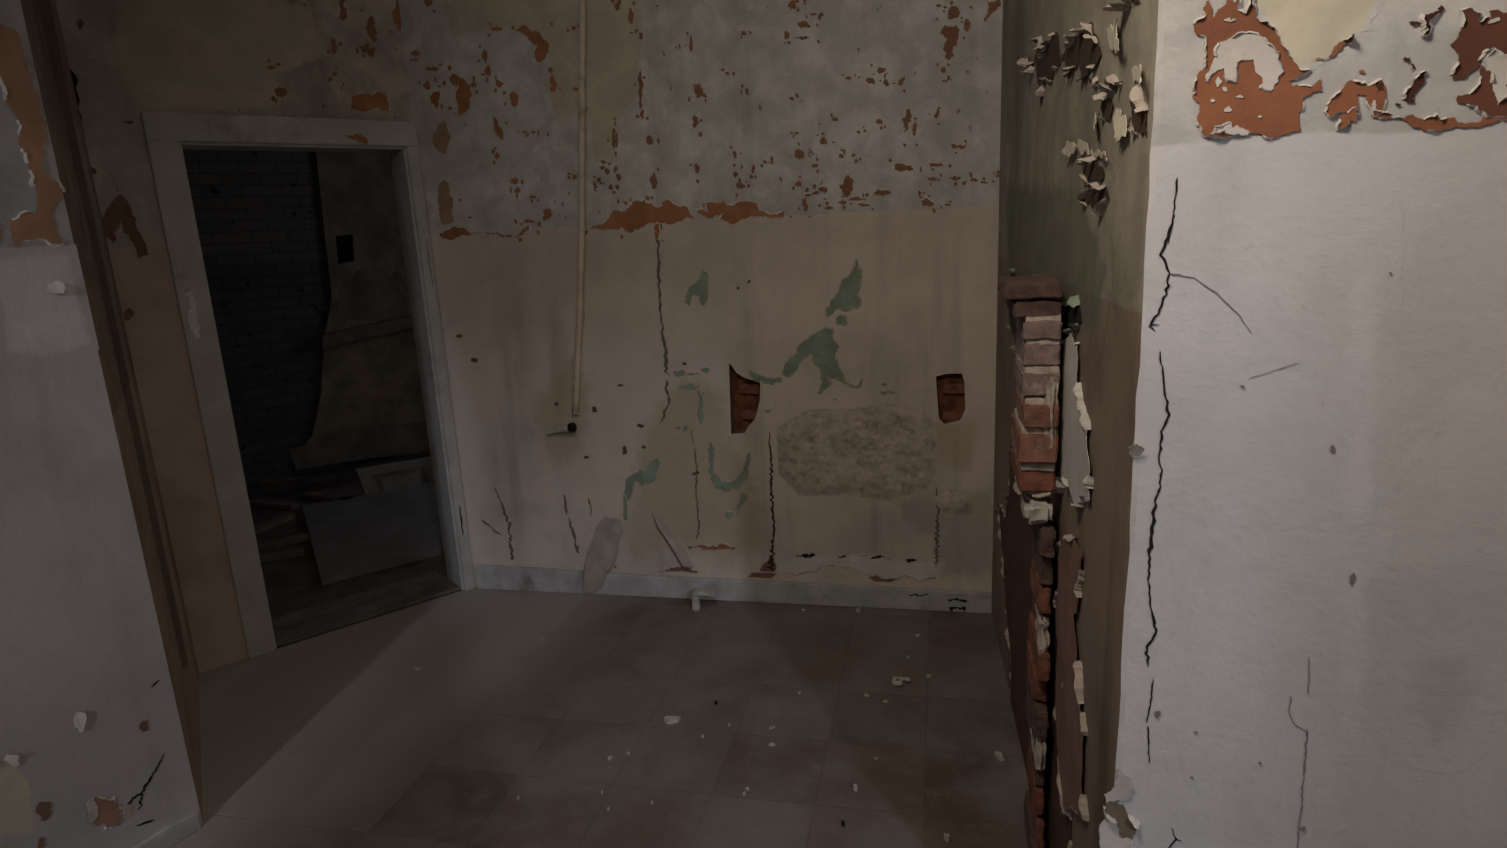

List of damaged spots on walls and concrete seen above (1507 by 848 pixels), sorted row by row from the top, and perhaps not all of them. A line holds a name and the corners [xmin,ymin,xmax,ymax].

peeling [0,23,66,248]
peeling [327,0,579,165]
peeling [438,118,891,242]
peeling [842,63,1000,213]
peeling [936,0,1001,82]
peeling [1192,0,1507,141]
crack [655,224,700,539]
peeling [729,259,863,434]
spalling [936,373,965,423]
spalling [994,268,1140,848]
crack [1144,177,1252,764]
crack [1288,659,1310,848]